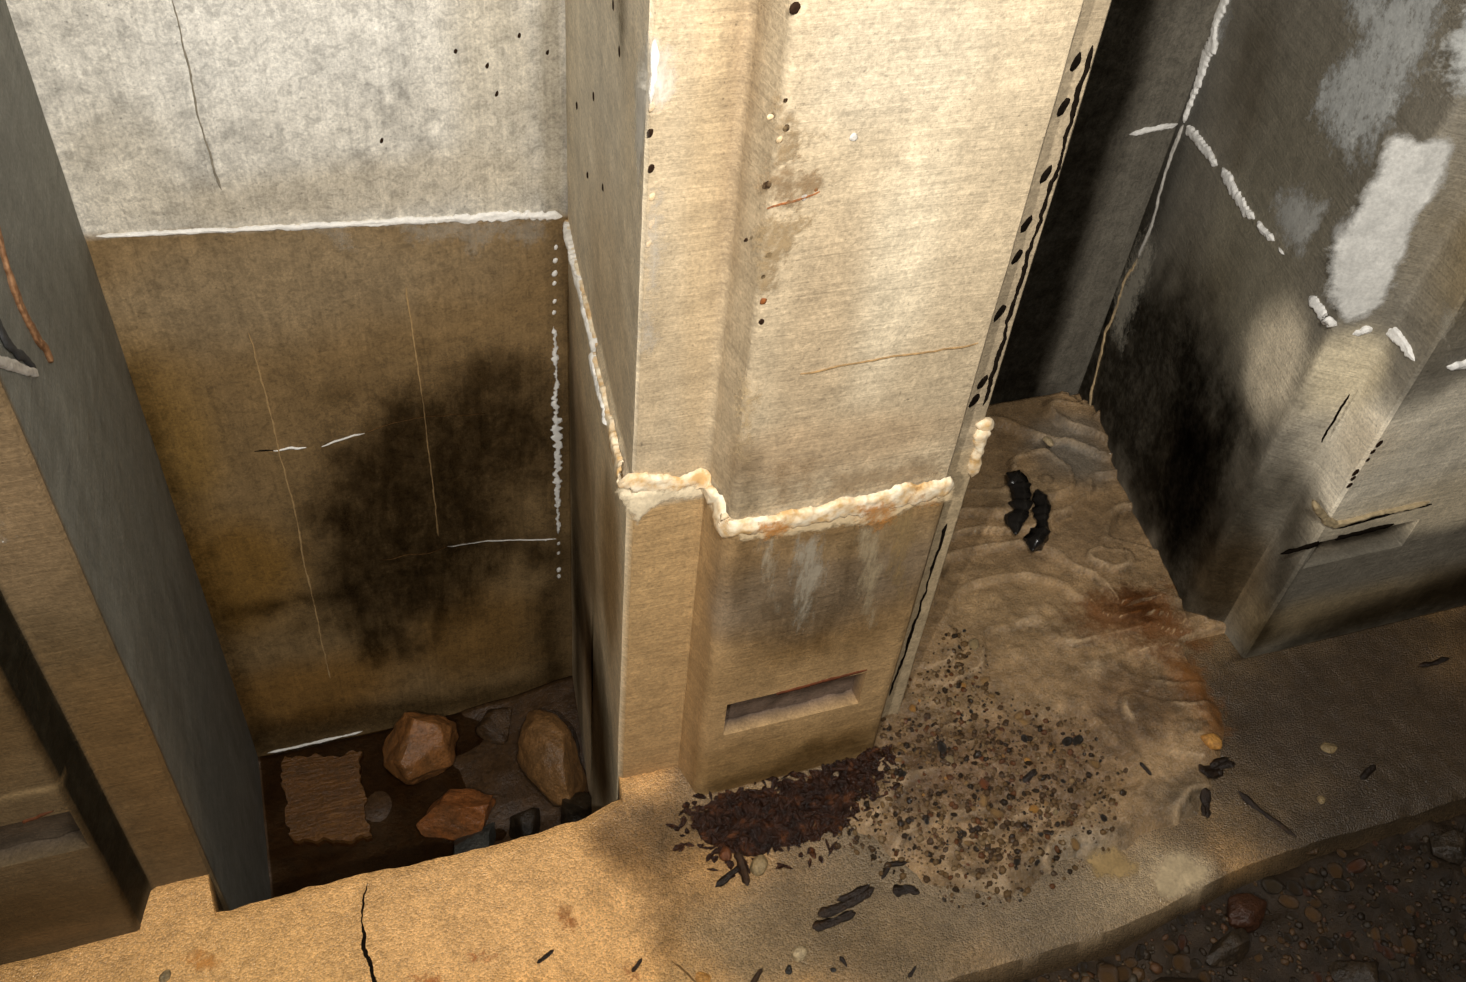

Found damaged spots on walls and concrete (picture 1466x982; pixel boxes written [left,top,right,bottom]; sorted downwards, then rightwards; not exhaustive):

rust [0,227,54,377]
crack [361,883,377,982]